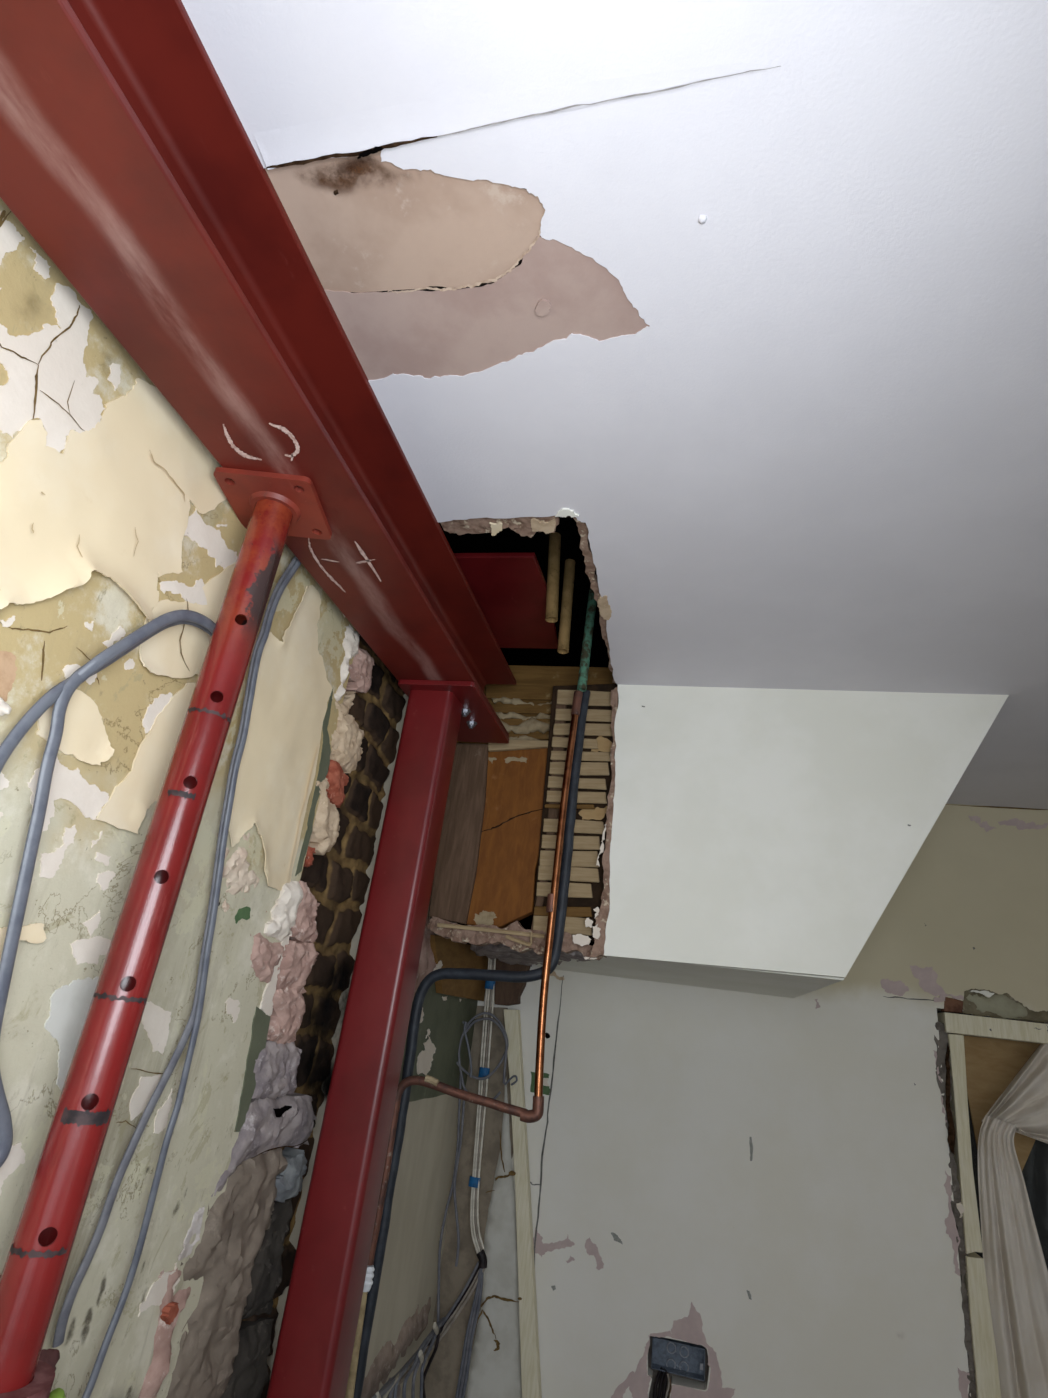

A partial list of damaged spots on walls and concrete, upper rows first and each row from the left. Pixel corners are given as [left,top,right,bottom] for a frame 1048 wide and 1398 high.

crack [254,62,780,170]
crack [0,210,11,227]
peeling [265,150,650,380]
crack [0,305,83,430]
peeling [0,211,238,891]
peeling [0,923,47,960]
peeling [44,910,111,1091]
peeling [138,585,374,1398]
peeling [129,1074,173,1134]
peeling [0,1142,26,1195]
spalling [39,1349,60,1370]
peeling [611,1302,735,1398]